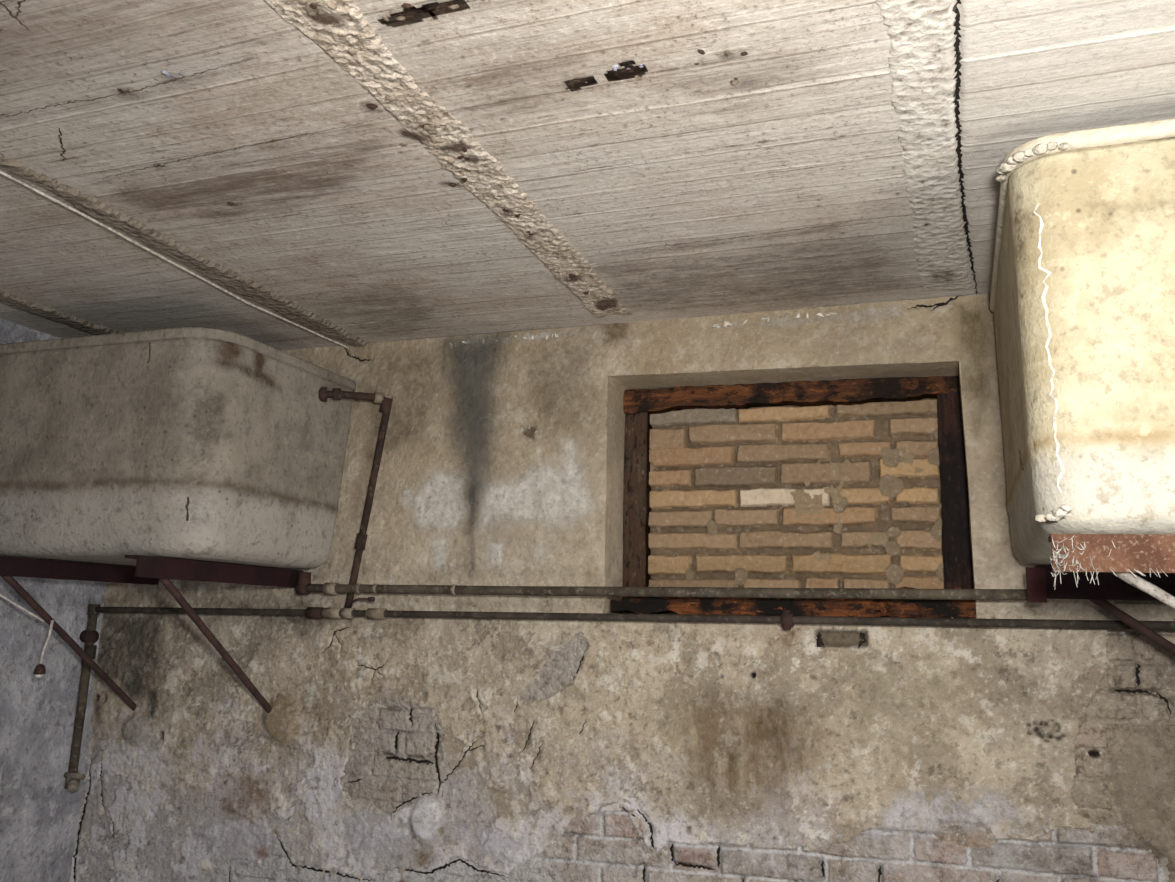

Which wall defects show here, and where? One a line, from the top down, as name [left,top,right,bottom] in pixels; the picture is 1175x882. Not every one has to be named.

crack [0,0,31,32]
crack [907,0,979,311]
leakage [451,341,495,516]
crack [72,760,114,881]
crack [275,833,509,881]
crack [387,723,484,814]
crack [514,702,543,770]
flaking render [185,618,1175,882]